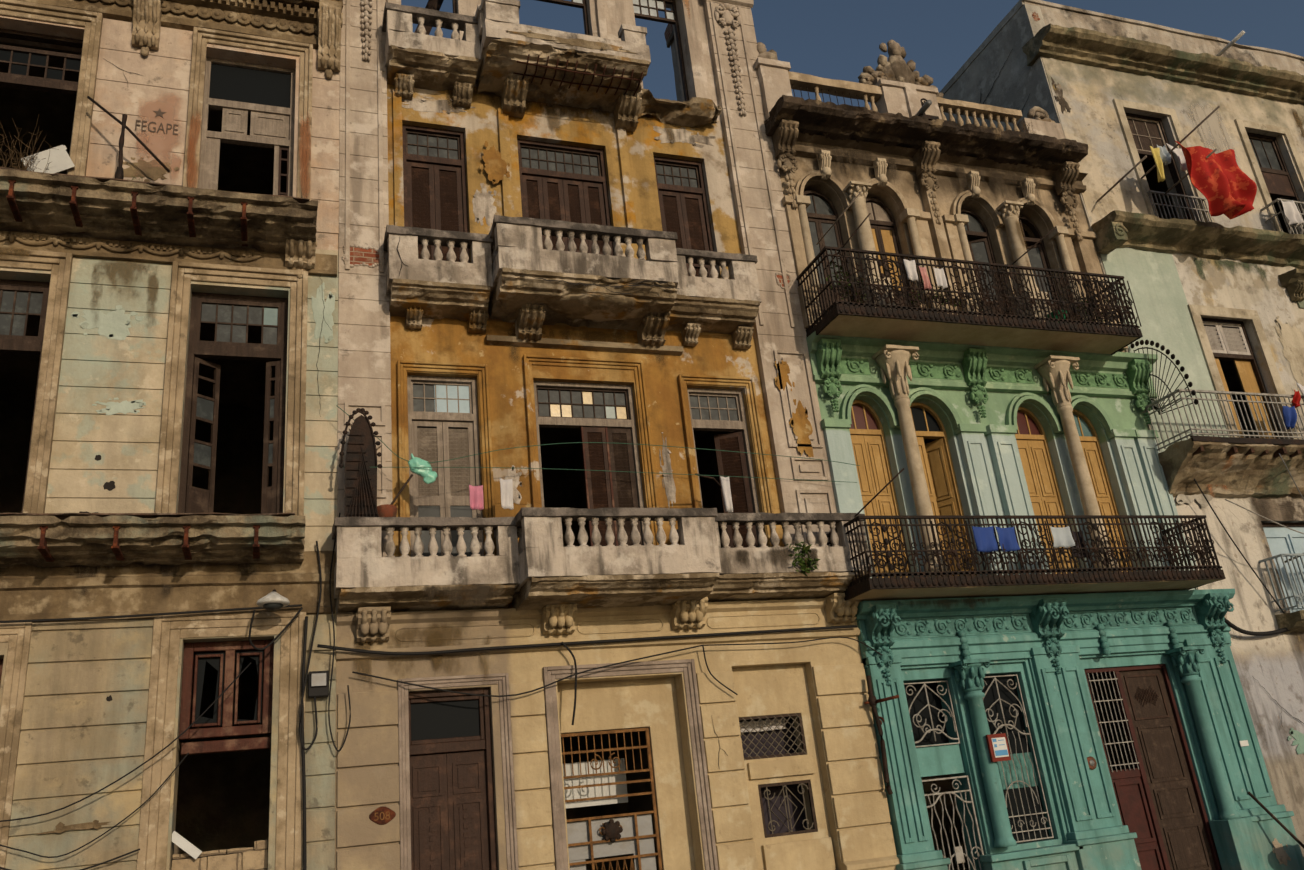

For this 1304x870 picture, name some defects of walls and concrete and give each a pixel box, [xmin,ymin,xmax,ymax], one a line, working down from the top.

rust [187,115,200,187]
peeling [472,141,510,226]
flaking render [341,244,388,268]
damp [94,261,158,312]
peeling [92,398,146,415]